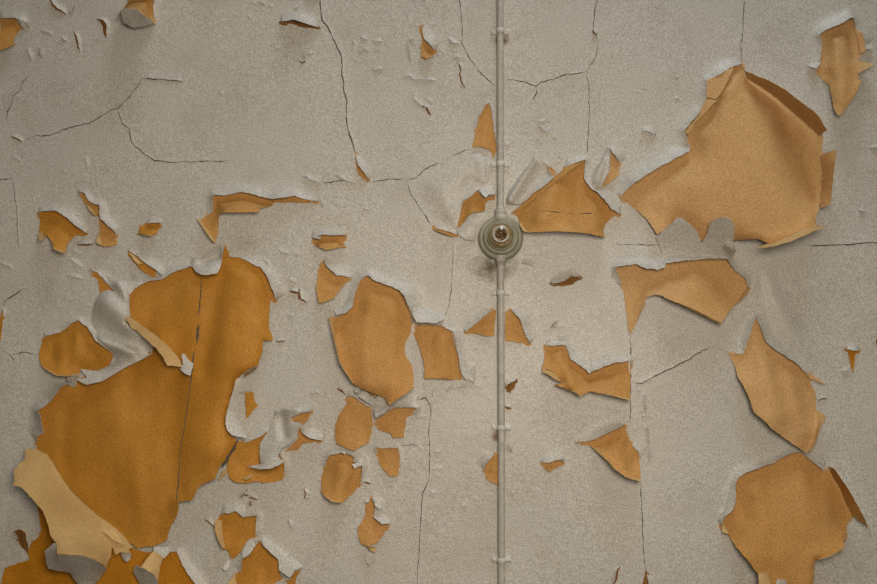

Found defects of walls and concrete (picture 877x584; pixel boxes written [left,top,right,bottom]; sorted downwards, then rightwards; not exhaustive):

peeling [0,0,163,62]
crack [26,68,229,163]
crack [319,0,361,153]
peeling [336,151,374,184]
crack [459,0,603,154]
peeling [432,53,837,334]
peeling [805,3,876,115]
crack [176,281,202,503]
crack [222,440,238,468]
peeling [0,172,654,584]
crack [623,335,727,426]
peeling [715,310,872,584]